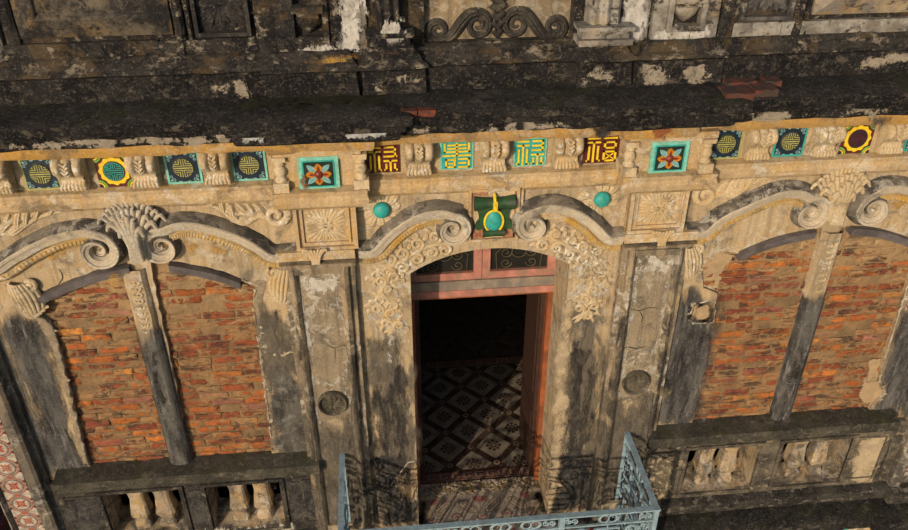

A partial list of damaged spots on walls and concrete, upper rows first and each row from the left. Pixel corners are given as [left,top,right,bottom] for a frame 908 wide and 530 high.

flaking render [37,317,90,465]
flaking render [241,278,293,450]